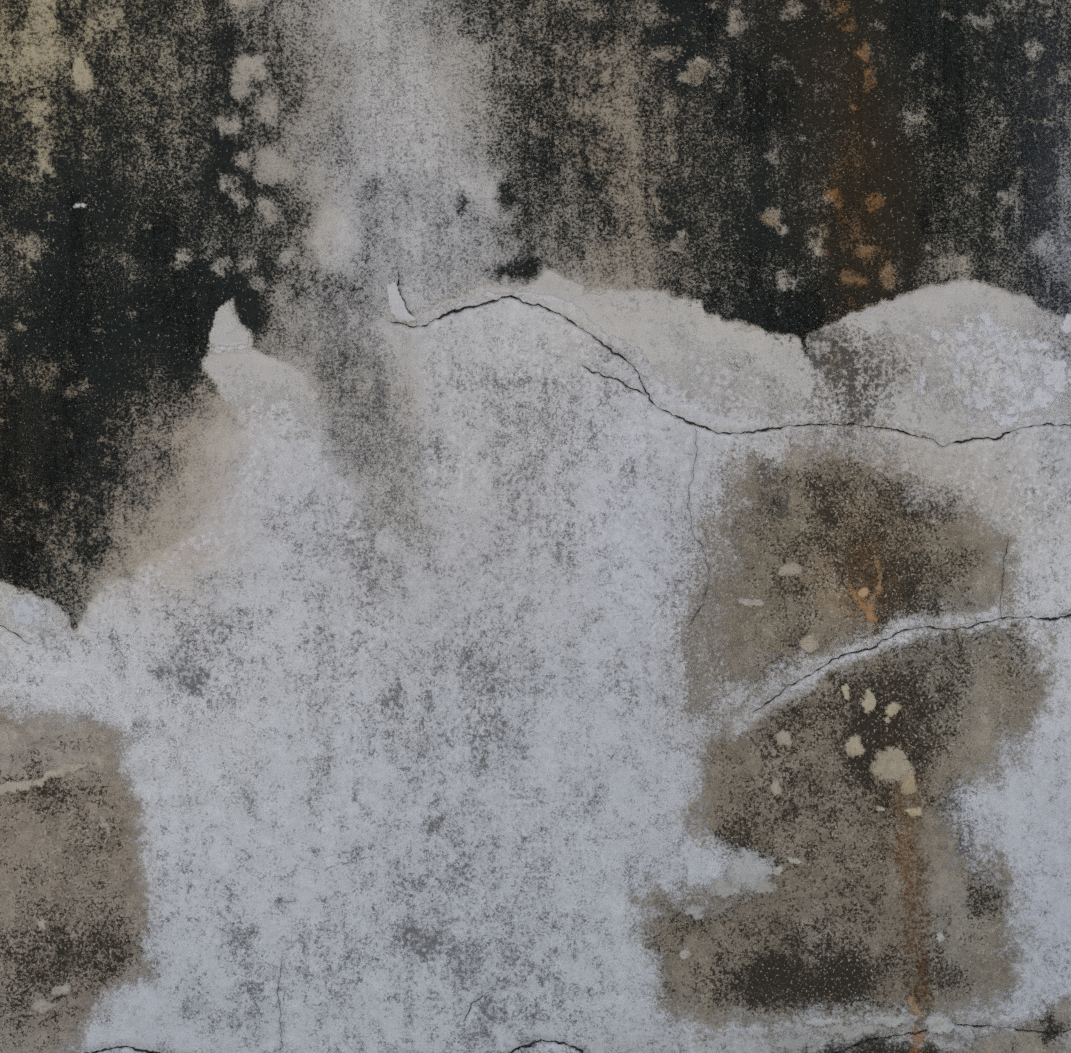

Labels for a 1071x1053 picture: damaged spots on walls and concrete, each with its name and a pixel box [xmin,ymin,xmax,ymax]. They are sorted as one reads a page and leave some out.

rust [819,0,898,324]
water stain [0,0,1071,629]
crack [393,271,1069,623]
water stain [671,443,790,721]
rust [847,556,882,622]
crack [753,540,1071,712]
water stain [0,762,88,796]
rust [889,773,932,1053]
crack [85,1045,160,1053]
crack [510,1039,583,1053]
crack [835,1029,928,1053]
crack [954,1023,1070,1034]